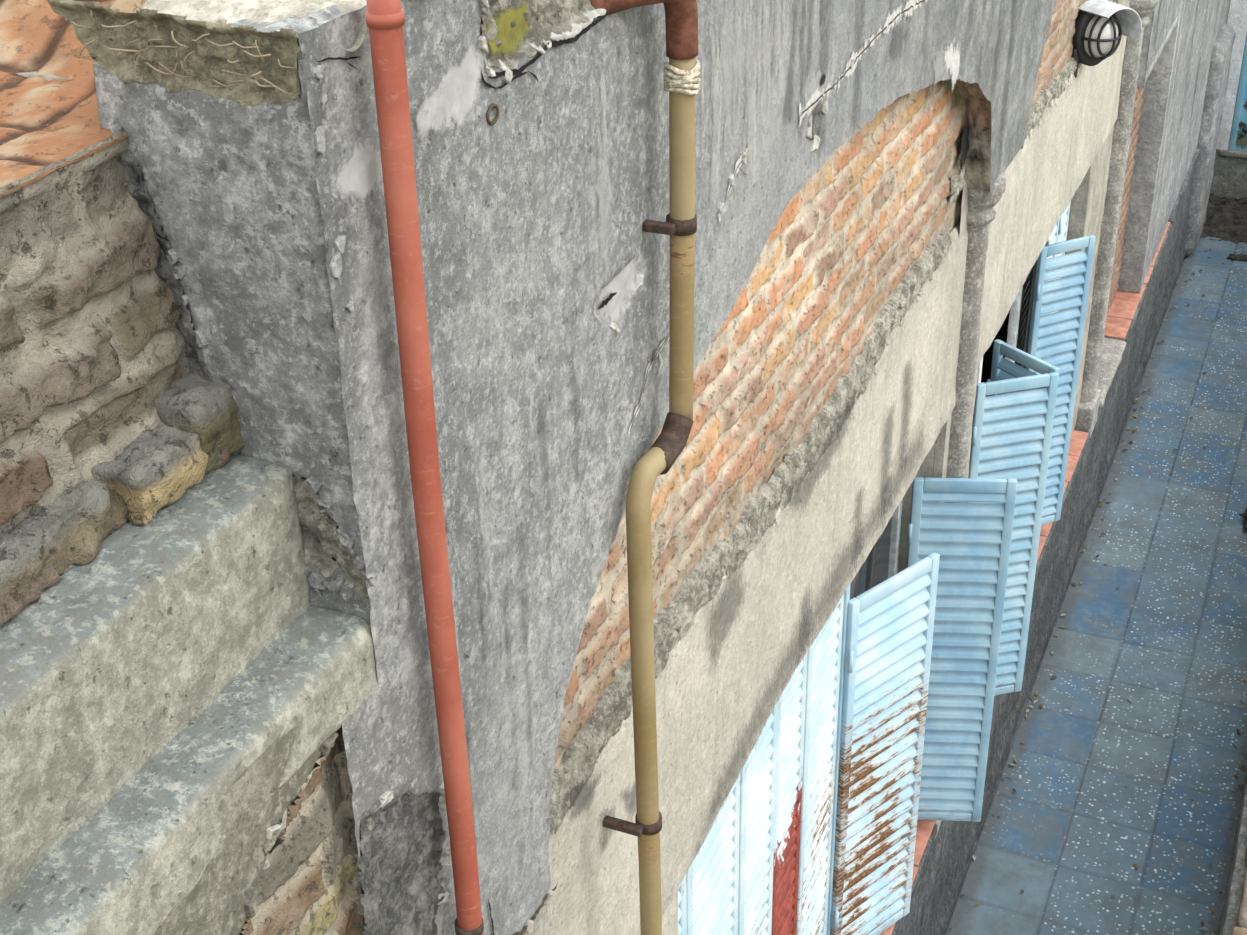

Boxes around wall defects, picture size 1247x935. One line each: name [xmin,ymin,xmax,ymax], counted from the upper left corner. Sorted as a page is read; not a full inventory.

spalling [47,0,302,106]
spalling [478,0,610,84]
crack [799,0,927,127]
spalling [312,126,325,154]
spalling [806,101,828,151]
spalling [948,125,969,207]
peeling [1236,102,1247,149]
spalling [326,235,346,279]
spalling [593,257,646,334]
spalling [653,228,952,679]
spalling [549,653,633,837]
spalling [241,726,451,935]